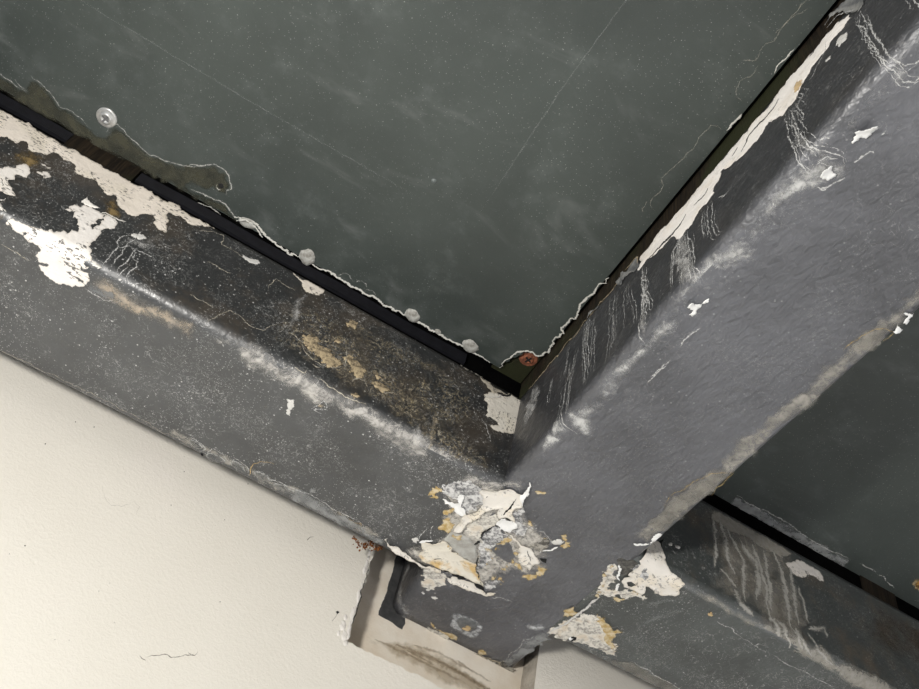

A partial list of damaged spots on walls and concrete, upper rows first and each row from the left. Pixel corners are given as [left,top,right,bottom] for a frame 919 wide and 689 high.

peeling [615,0,864,285]
crack [732,100,778,156]
peeling [0,110,215,301]
crack [649,188,708,258]
peeling [461,365,520,434]
peeling [384,480,564,600]
peeling [615,533,685,596]